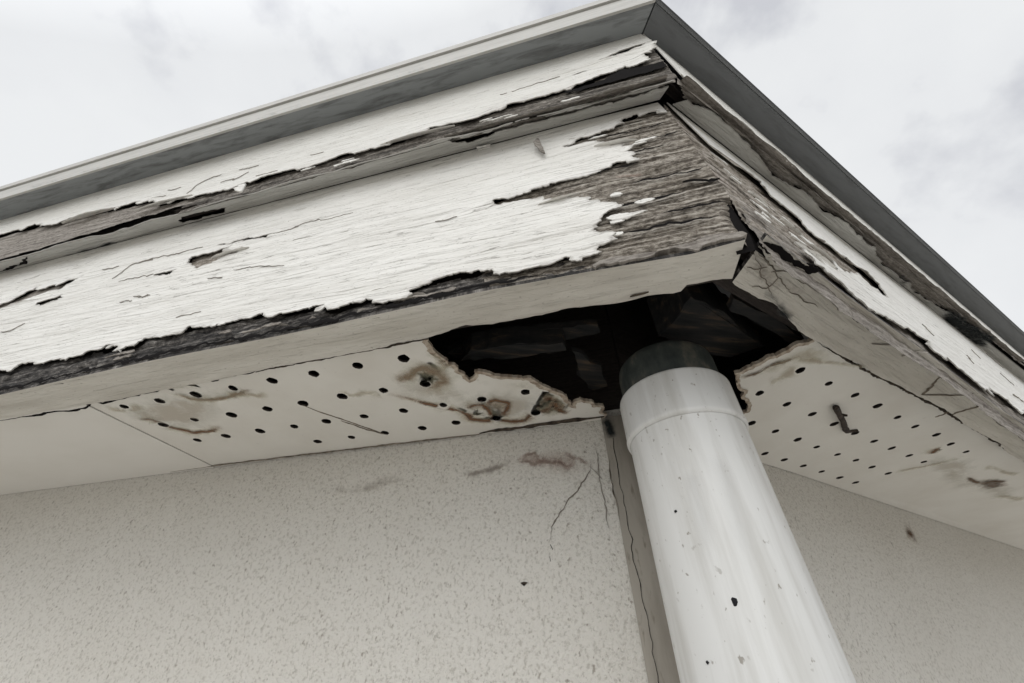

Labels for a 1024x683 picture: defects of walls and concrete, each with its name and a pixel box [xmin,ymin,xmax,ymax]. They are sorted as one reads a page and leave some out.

peeling [0,49,1024,366]
crack [597,121,853,306]
damp [143,418,216,434]
damp [182,391,244,401]
damp [398,360,447,387]
damp [419,399,531,423]
spalling [734,338,814,414]
crack [966,349,1024,402]
crack [173,405,659,683]